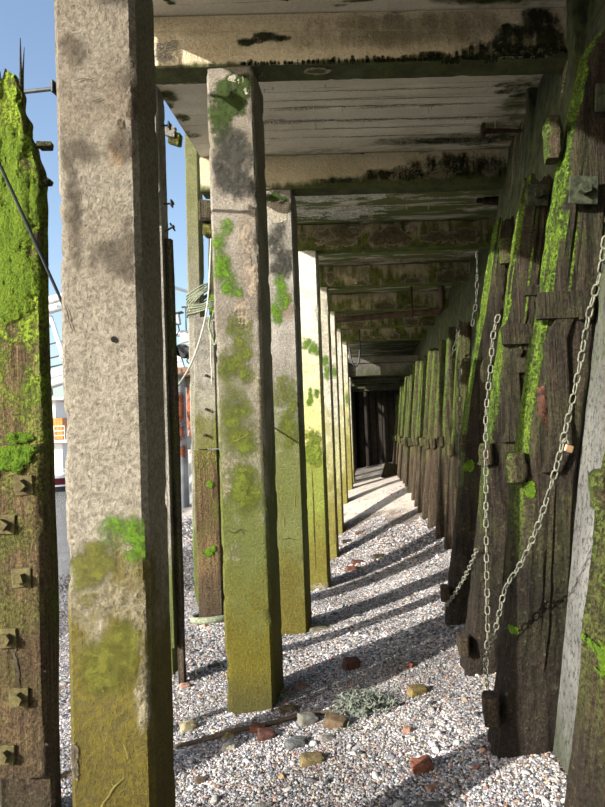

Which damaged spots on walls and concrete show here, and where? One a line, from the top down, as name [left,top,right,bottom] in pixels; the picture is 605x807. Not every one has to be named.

damp [237,0,568,97]
damp [212,128,255,198]
damp [317,114,526,203]
damp [268,222,293,279]
damp [294,193,490,248]